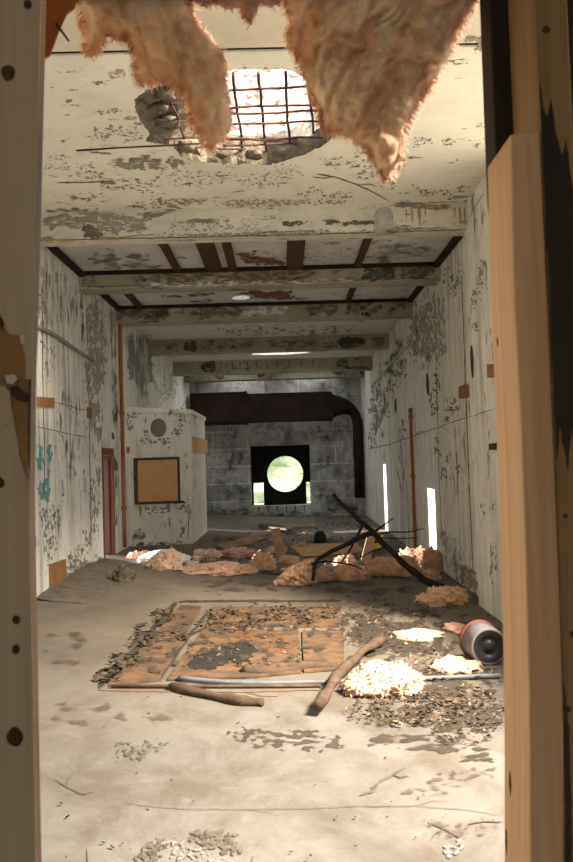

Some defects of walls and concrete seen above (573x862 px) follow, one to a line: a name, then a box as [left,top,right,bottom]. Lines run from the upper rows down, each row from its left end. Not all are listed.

spalling [42,67,433,240]
rust [236,250,285,266]
peeling [471,259,487,309]
peeling [84,300,108,437]
peeling [368,266,462,448]
peeling [39,504,61,566]
peeling [68,453,101,571]